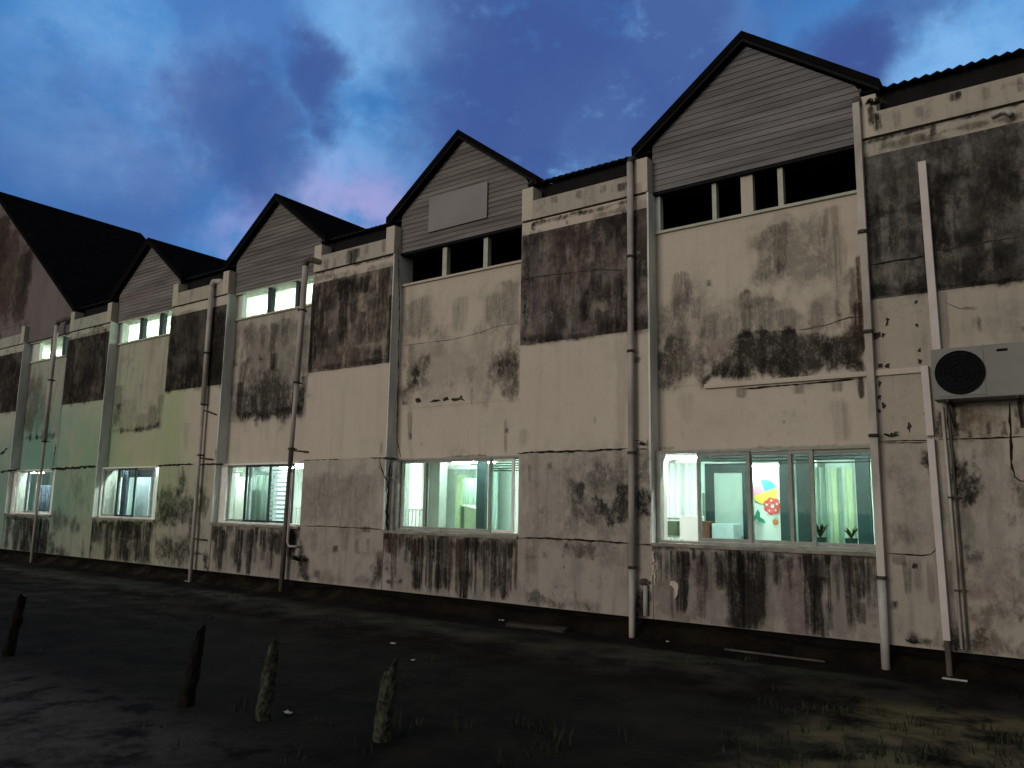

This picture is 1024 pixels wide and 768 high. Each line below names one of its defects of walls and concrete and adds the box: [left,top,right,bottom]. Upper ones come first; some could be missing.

damp [868,106,935,143]
damp [317,249,393,341]
damp [166,302,192,391]
damp [209,311,225,385]
damp [236,286,320,419]
damp [706,329,864,398]
crack [517,440,648,454]
damp [90,473,308,580]
damp [384,533,513,599]
damp [597,485,651,525]
damp [653,547,765,629]
damp [800,553,870,637]